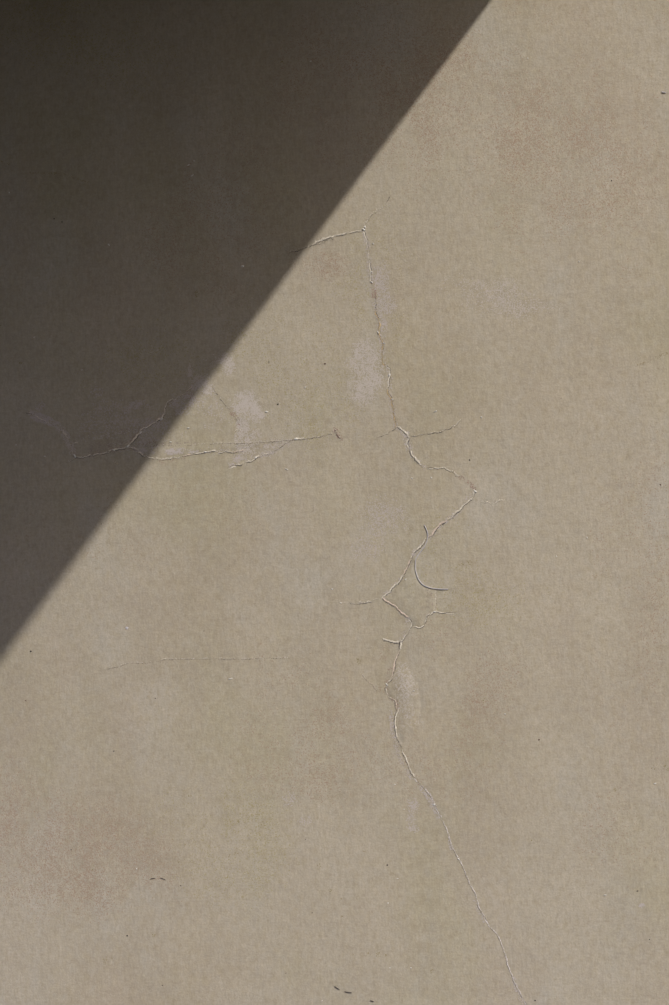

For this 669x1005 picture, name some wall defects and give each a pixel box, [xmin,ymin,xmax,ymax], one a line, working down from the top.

crack [28,386,343,468]
crack [290,198,526,1005]